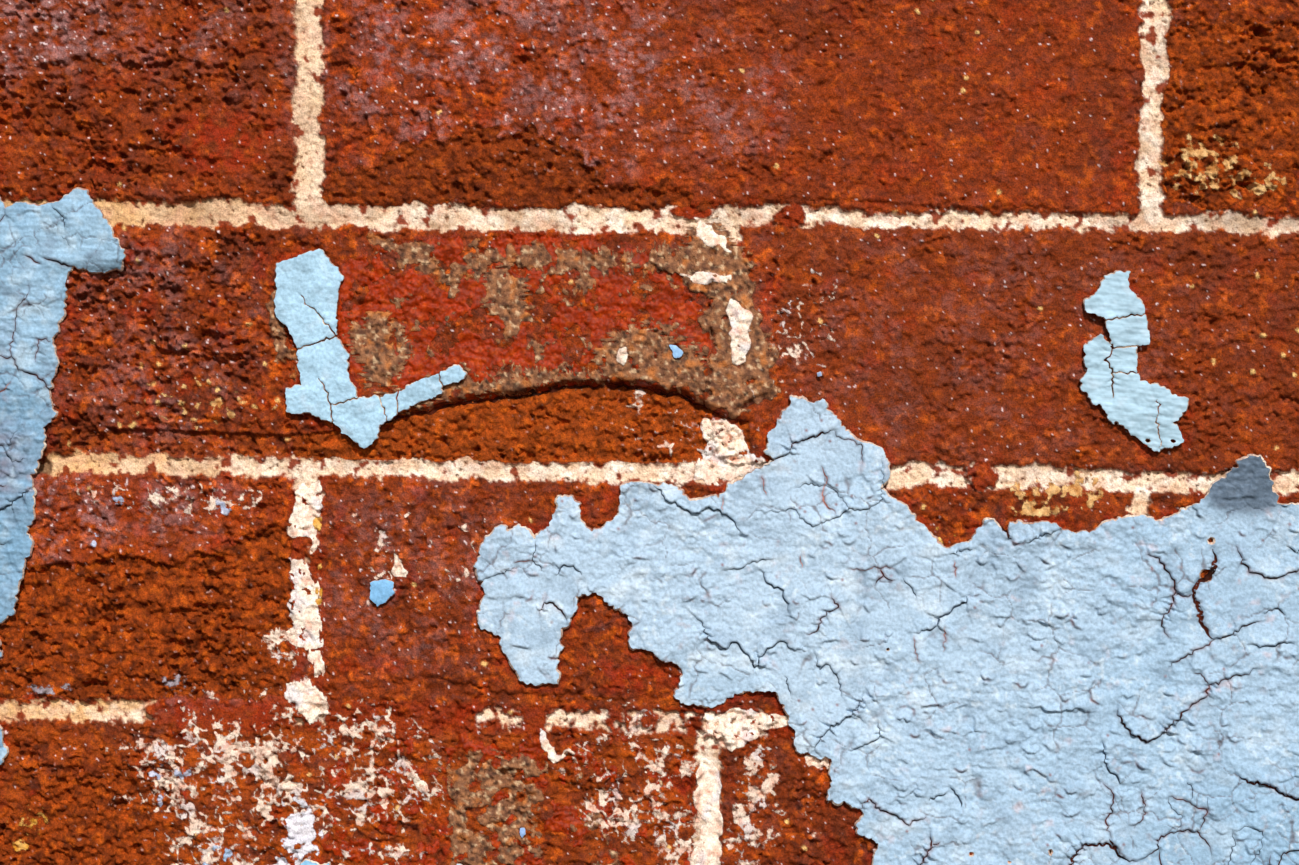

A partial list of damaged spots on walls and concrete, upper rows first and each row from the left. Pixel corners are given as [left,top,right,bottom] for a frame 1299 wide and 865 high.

crack [0,207,70,392]
spalling [0,187,325,703]
crack [654,430,884,531]
peeling [273,122,1299,865]
peeling [0,725,9,765]
spalling [0,760,202,865]
damp [106,688,445,865]
damp [559,699,703,865]
crack [691,557,880,750]
crack [849,549,972,660]
crack [861,787,962,865]
crack [1070,546,1299,865]